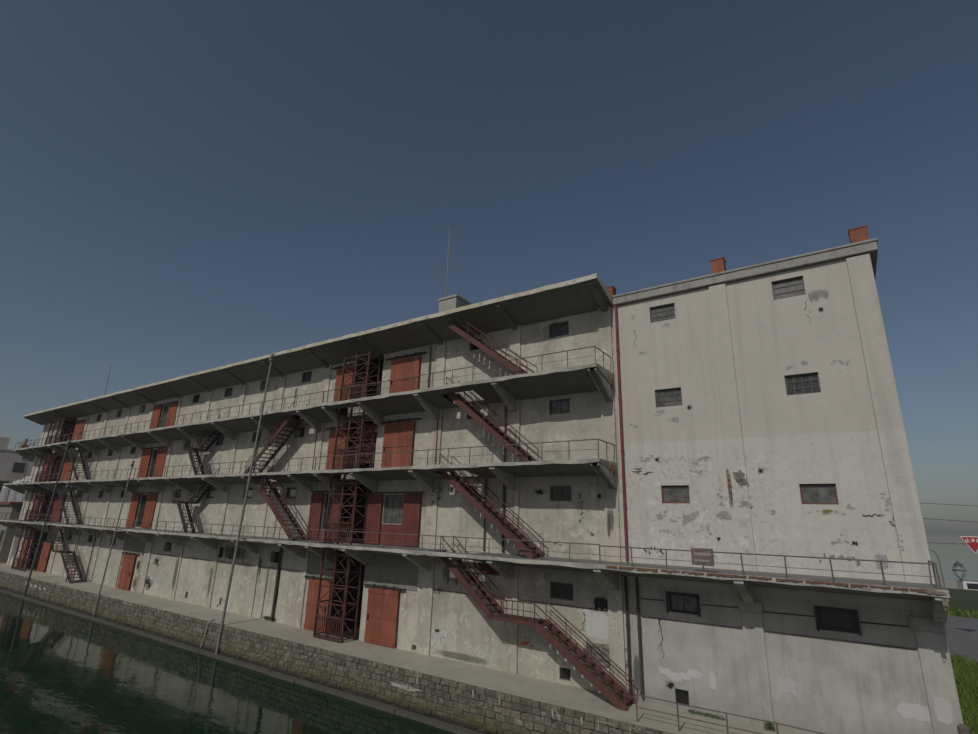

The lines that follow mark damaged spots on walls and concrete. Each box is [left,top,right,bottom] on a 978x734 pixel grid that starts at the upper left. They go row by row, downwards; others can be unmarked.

peeling [632,455,710,475]
spalling [732,470,749,487]
peeling [656,489,753,541]
peeling [819,534,861,566]